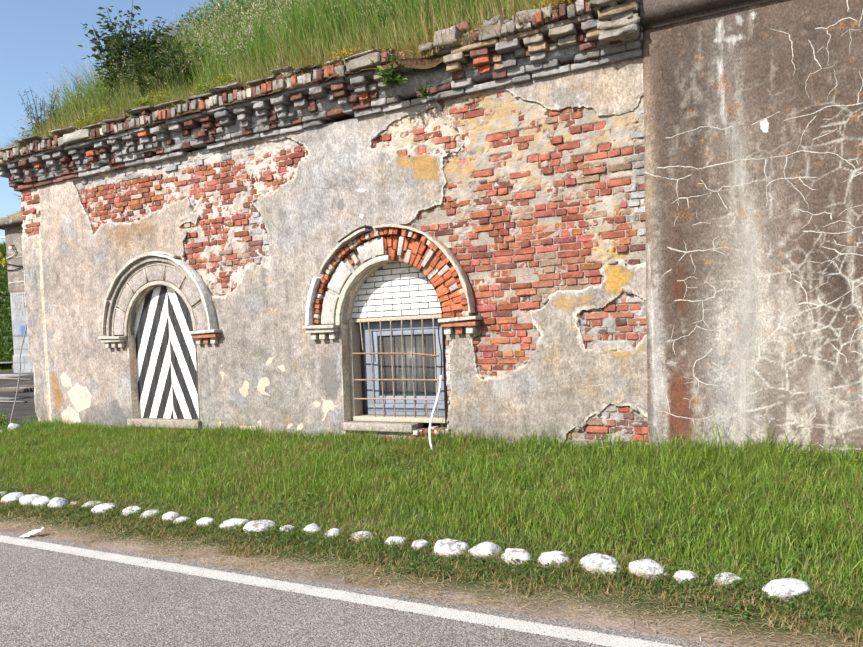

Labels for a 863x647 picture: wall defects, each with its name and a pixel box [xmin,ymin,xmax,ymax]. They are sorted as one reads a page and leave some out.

spalling [20,183,40,236]
spalling [74,138,308,305]
spalling [369,87,647,378]
crack [644,0,863,438]
spalling [563,404,648,450]
rust [670,374,689,442]
crack [801,394,863,448]